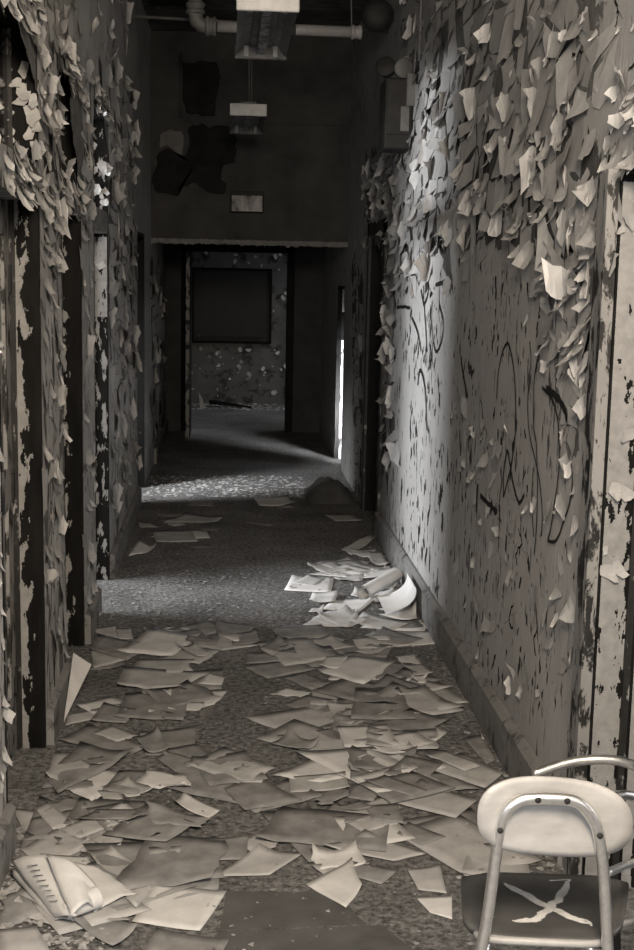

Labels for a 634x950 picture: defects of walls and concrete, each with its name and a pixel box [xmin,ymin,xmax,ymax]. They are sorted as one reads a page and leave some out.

peeling [0,744,13,794]
peeling [590,764,616,791]
peeling [621,674,634,888]